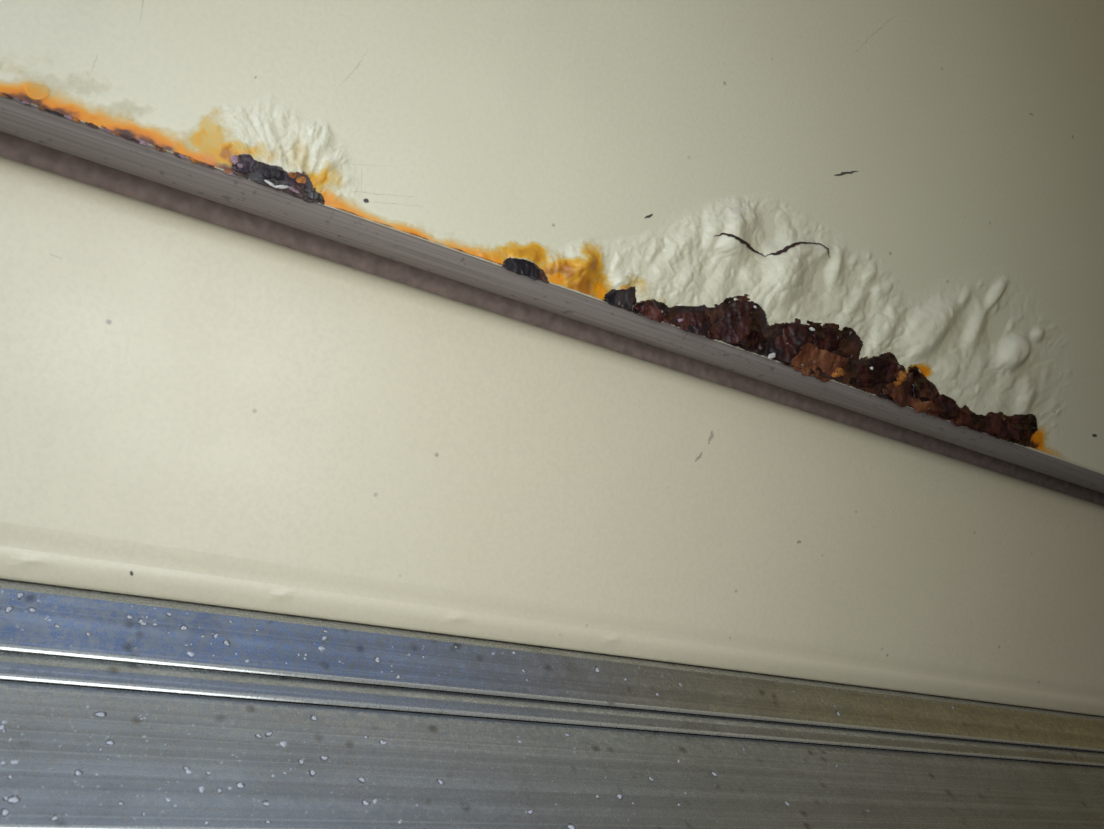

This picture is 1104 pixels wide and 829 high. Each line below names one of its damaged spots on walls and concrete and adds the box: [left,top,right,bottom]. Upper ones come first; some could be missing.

rust [0,82,1053,454]
crack [715,233,830,258]